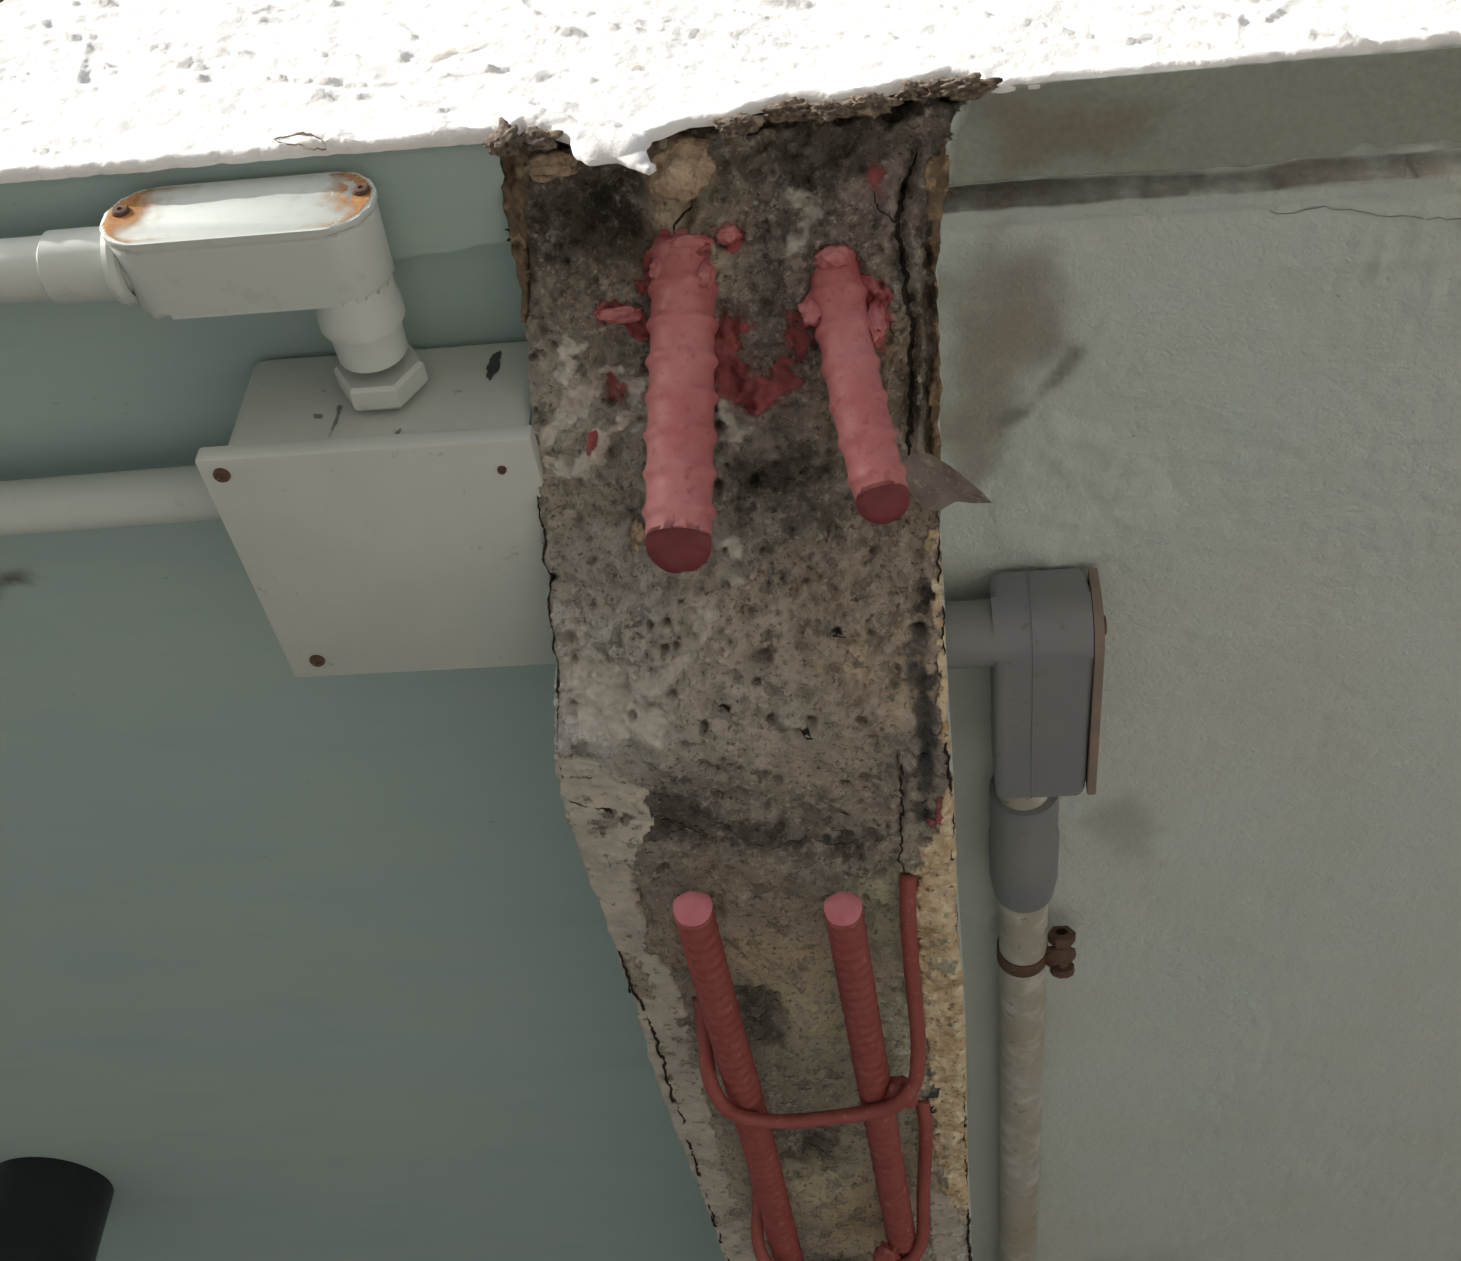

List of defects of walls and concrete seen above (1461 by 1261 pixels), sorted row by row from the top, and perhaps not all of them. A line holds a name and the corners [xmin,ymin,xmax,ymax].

corrosion [101,187,168,242]
corrosion [325,172,372,226]
crack [1271,206,1461,221]
crack [870,148,918,456]
spalling [524,93,991,1261]